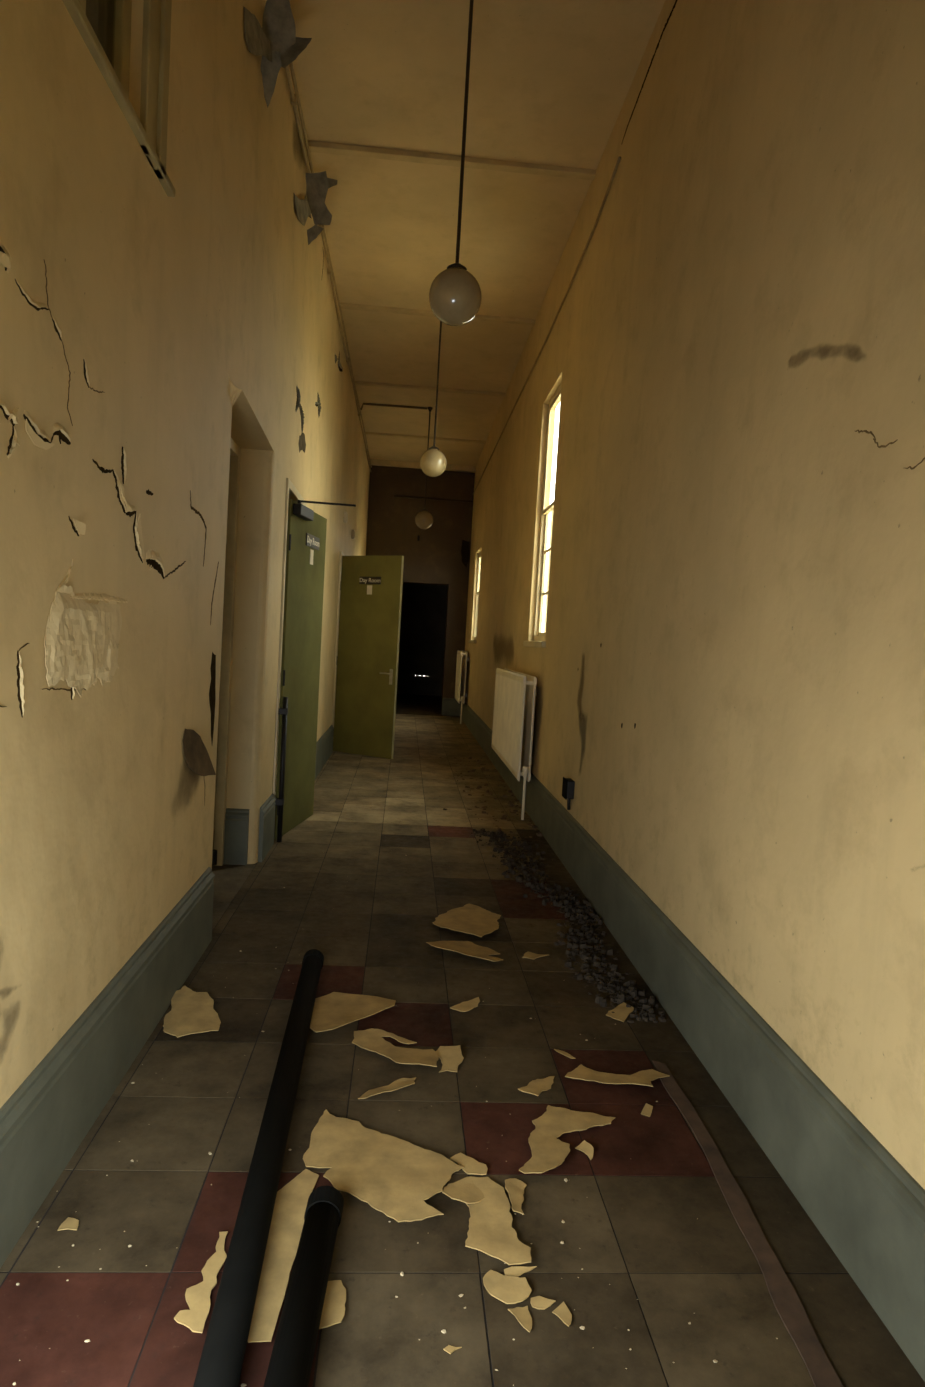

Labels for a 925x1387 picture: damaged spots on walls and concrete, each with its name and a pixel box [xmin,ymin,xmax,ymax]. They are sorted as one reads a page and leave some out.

peeling [244,0,312,108]
peeling [294,171,337,274]
crack [0,240,219,625]
crack [855,430,925,470]